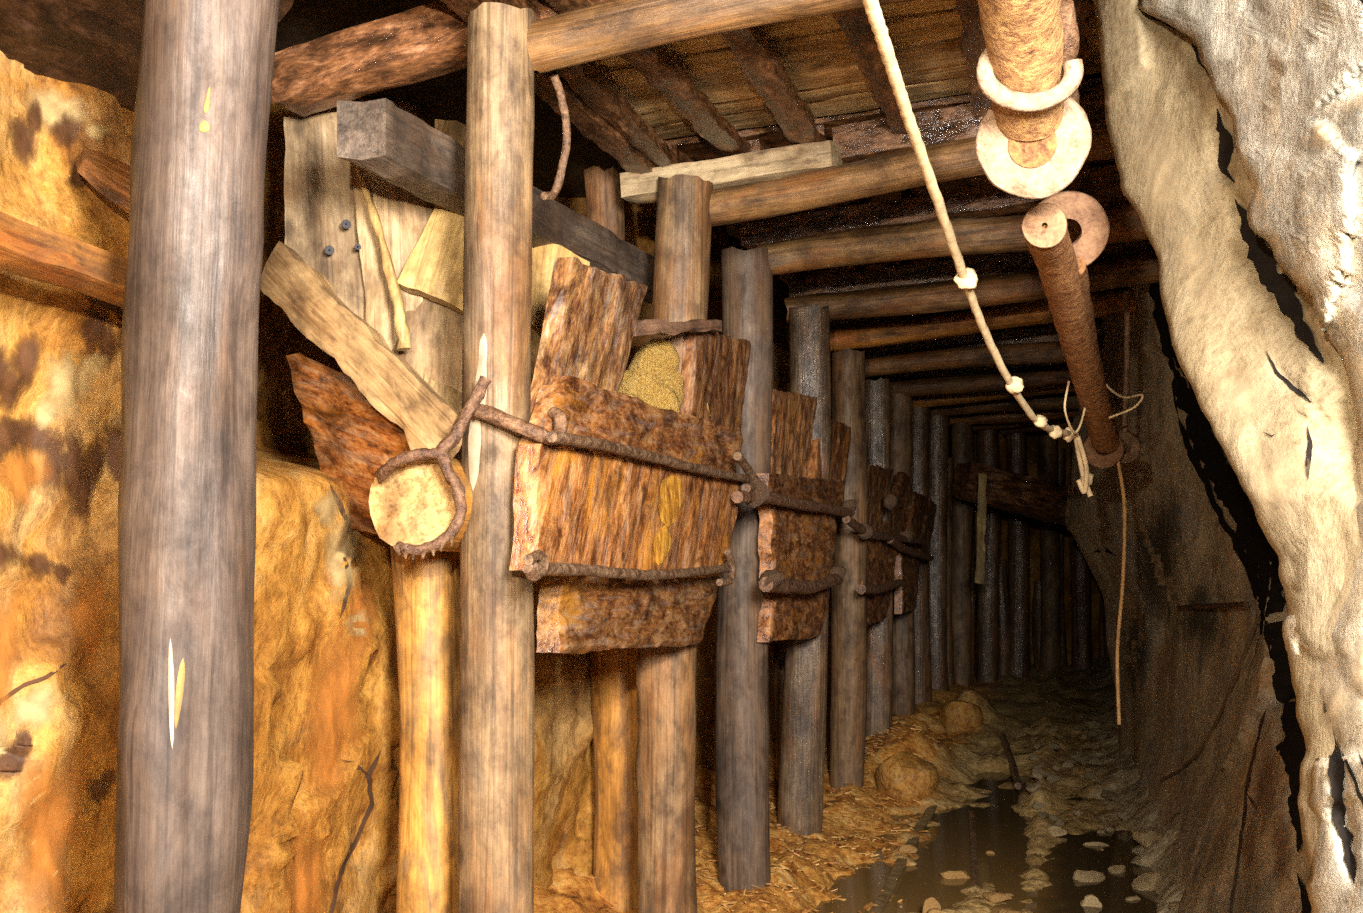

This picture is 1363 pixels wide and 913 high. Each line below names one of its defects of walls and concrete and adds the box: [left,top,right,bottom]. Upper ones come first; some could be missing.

rust [393,536,454,560]
crack [1149,283,1363,913]